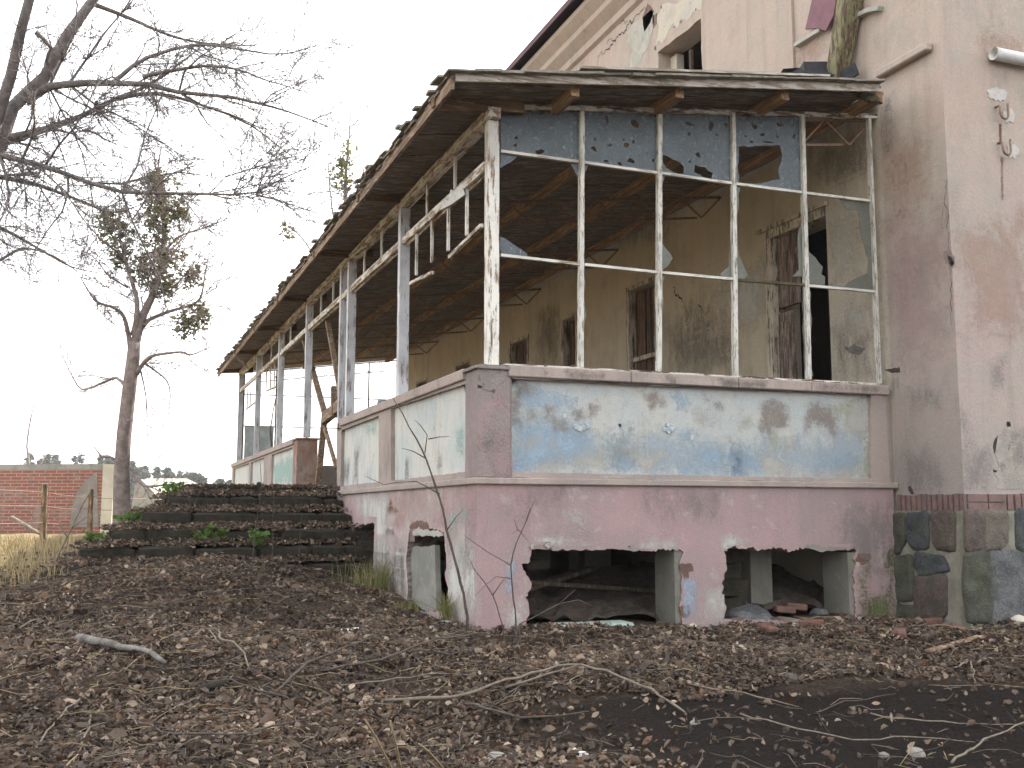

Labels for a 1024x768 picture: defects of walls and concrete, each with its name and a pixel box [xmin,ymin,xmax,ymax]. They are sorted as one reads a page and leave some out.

crack [597,7,645,65]
flaking render [627,0,702,68]
crack [941,182,952,325]
spalling [993,421,1024,491]
spalling [409,521,444,542]
peeling [526,536,570,560]